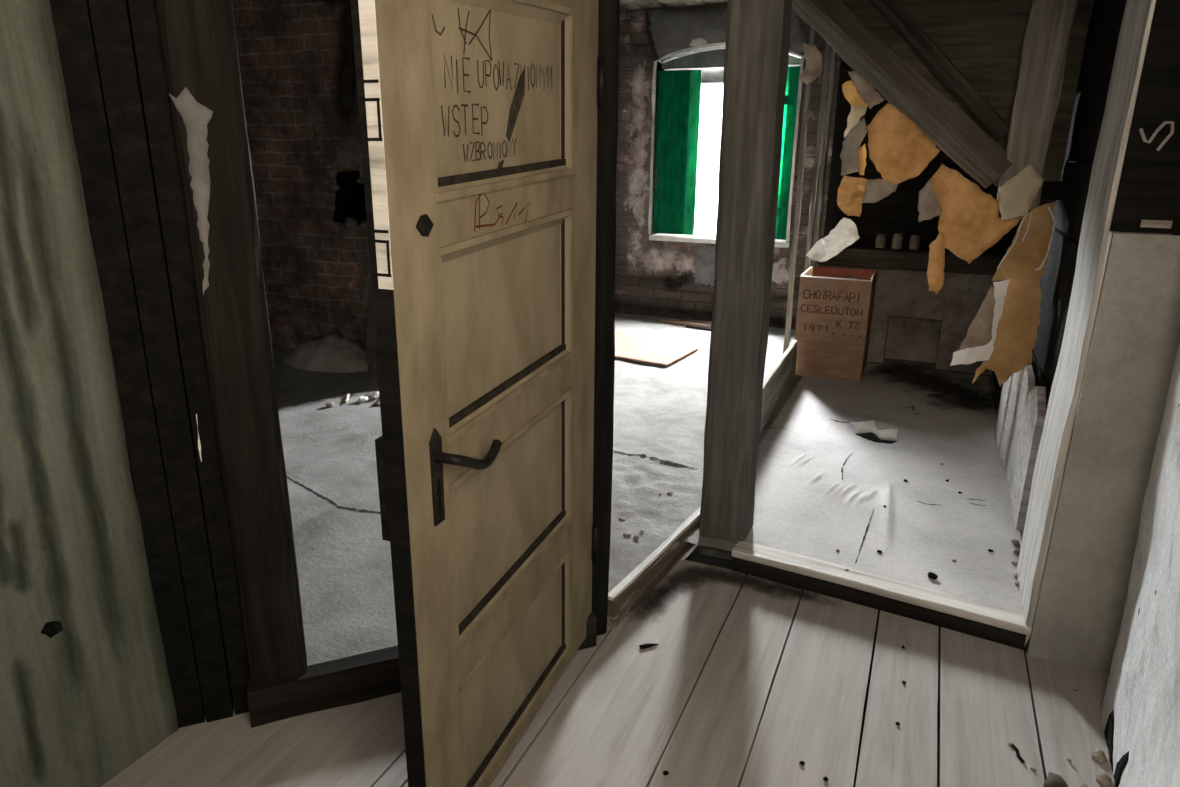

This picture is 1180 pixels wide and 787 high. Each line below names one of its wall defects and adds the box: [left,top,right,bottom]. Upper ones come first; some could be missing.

peeling [169,87,213,296]
peeling [325,134,367,228]